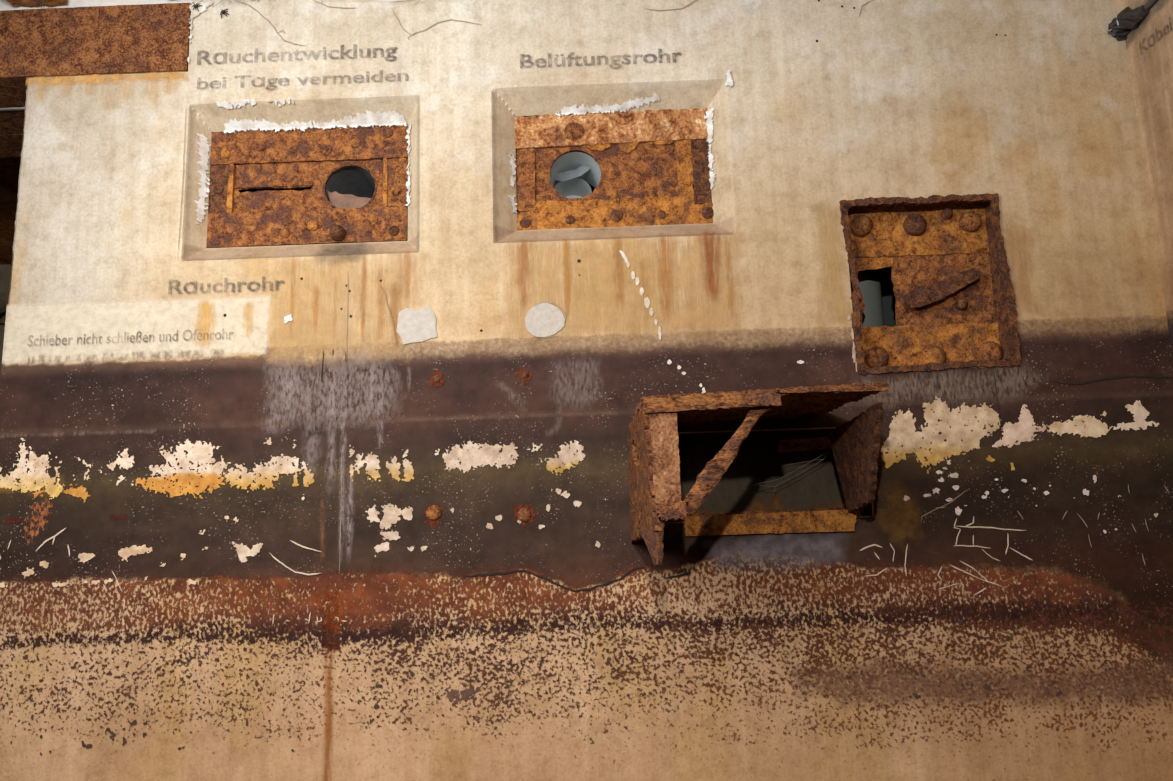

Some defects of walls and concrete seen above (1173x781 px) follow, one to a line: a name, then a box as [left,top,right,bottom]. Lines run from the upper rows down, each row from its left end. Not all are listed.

rust [513,233,735,331]
leakage [0,317,1173,756]
rust [0,545,1173,781]